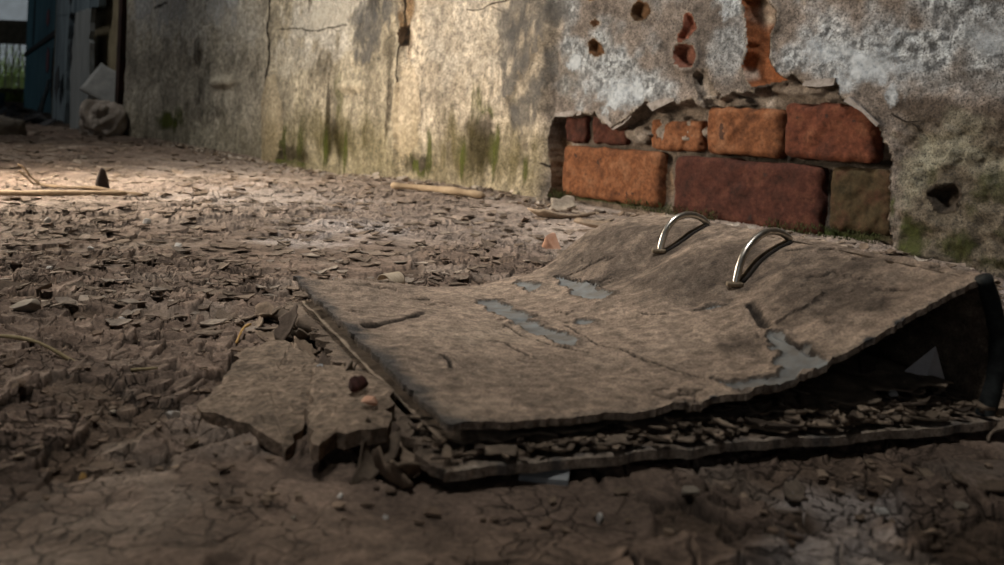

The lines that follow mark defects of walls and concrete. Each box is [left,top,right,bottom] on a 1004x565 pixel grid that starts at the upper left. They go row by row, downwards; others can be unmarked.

crack [264,0,347,87]
water stain [294,0,397,64]
crack [395,0,410,82]
water stain [297,90,348,171]
flaking render [527,0,893,249]